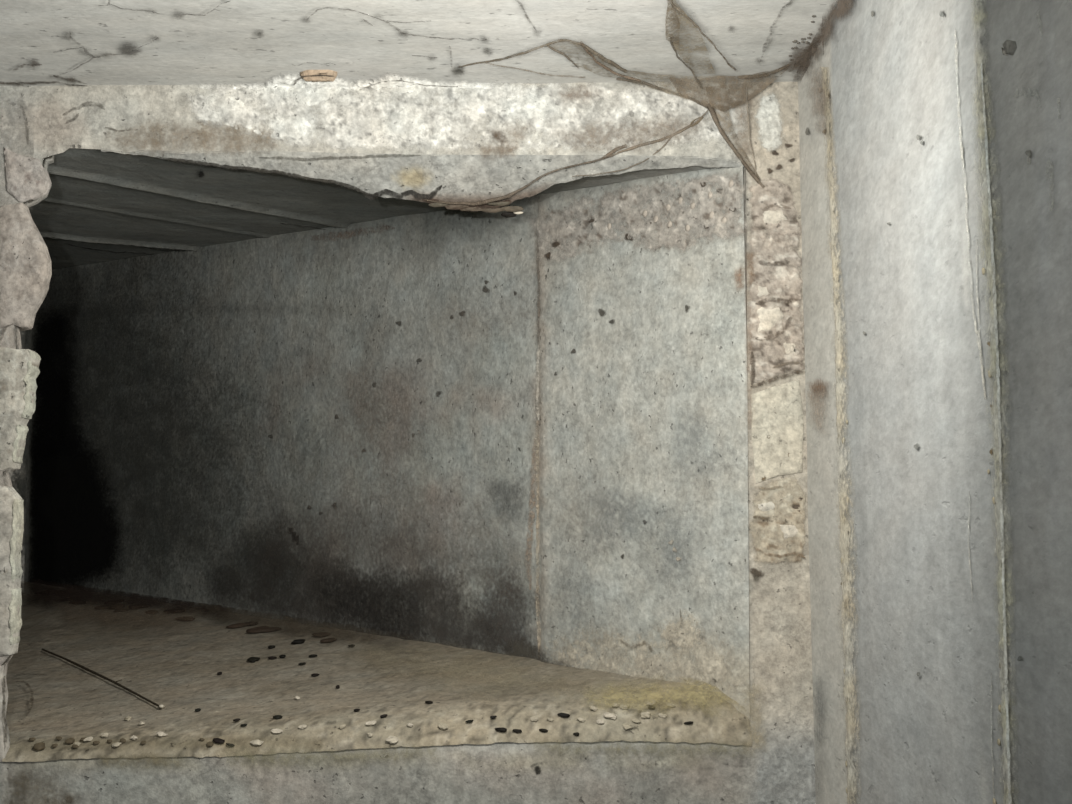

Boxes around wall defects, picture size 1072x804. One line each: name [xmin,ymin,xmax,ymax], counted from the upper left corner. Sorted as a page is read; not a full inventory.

crack [0,1,229,140]
crack [305,7,487,67]
crack [763,0,853,128]
flaking render [0,100,52,470]
flaking render [0,486,24,762]
damp [202,520,559,664]